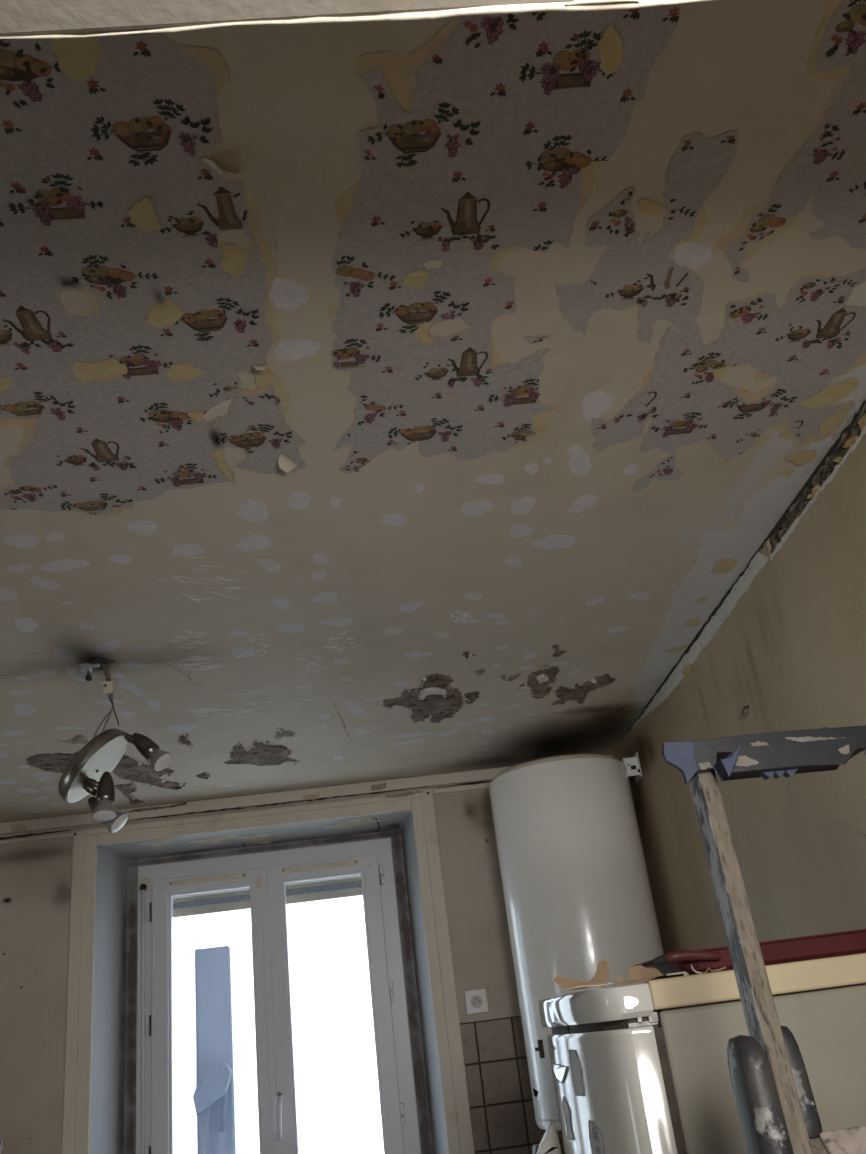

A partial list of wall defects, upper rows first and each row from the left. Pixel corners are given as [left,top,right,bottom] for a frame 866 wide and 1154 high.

flaking render [378,673,480,724]
flaking render [500,644,617,705]
flaking render [25,735,89,773]
flaking render [224,728,300,766]
flaking render [113,753,211,812]